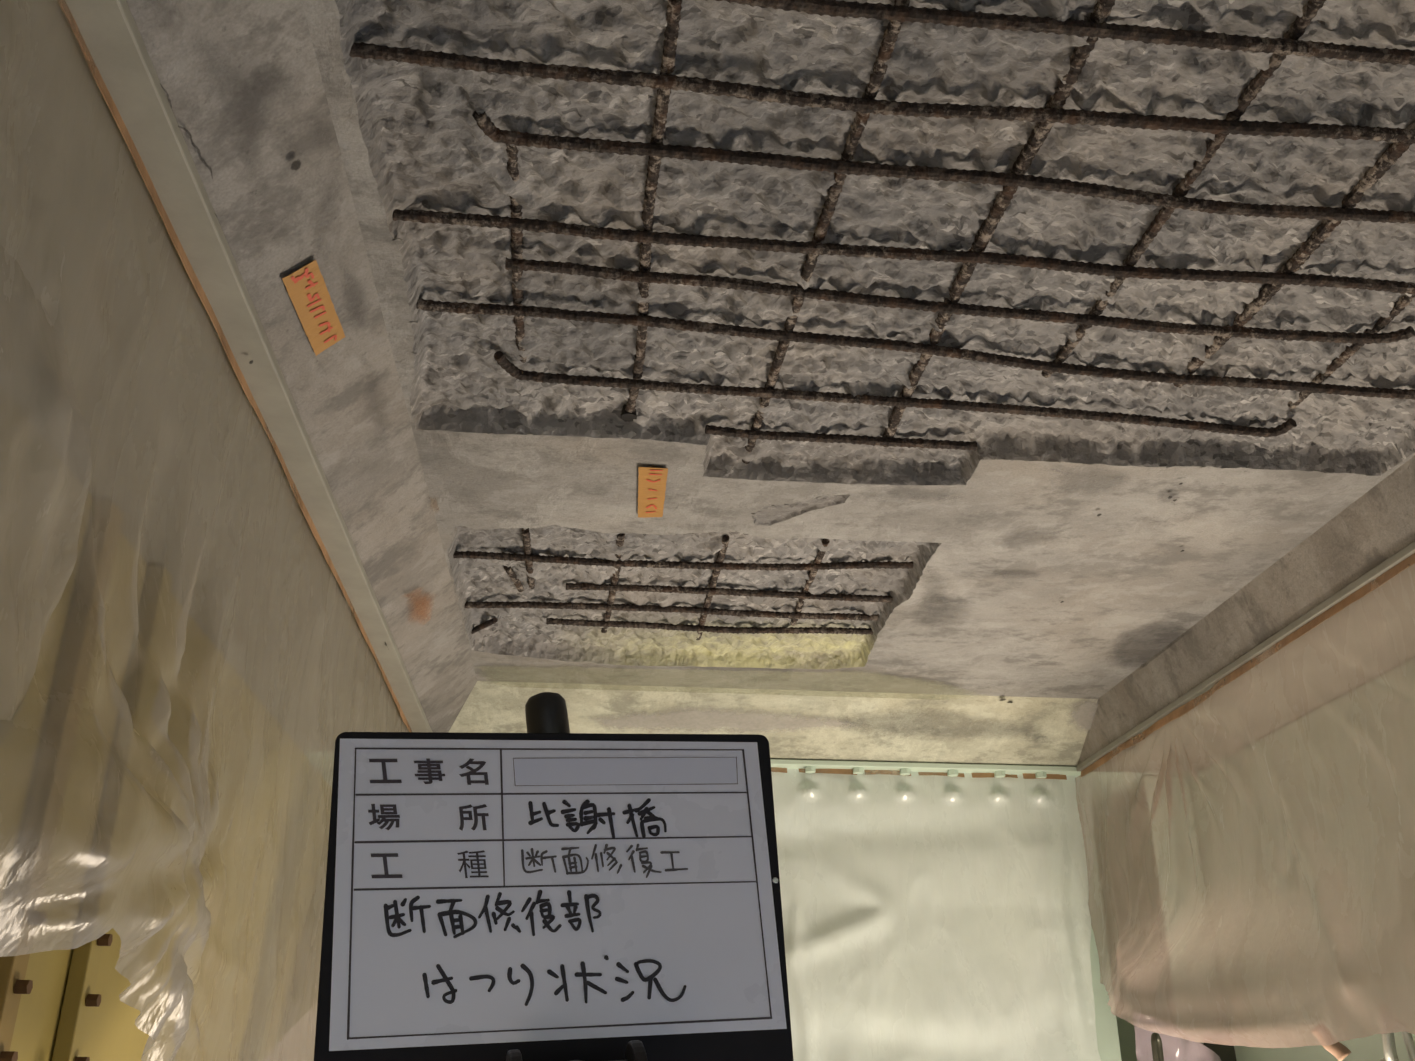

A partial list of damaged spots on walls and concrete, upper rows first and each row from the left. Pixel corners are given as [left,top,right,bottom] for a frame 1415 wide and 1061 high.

spalling [335,0,1415,669]